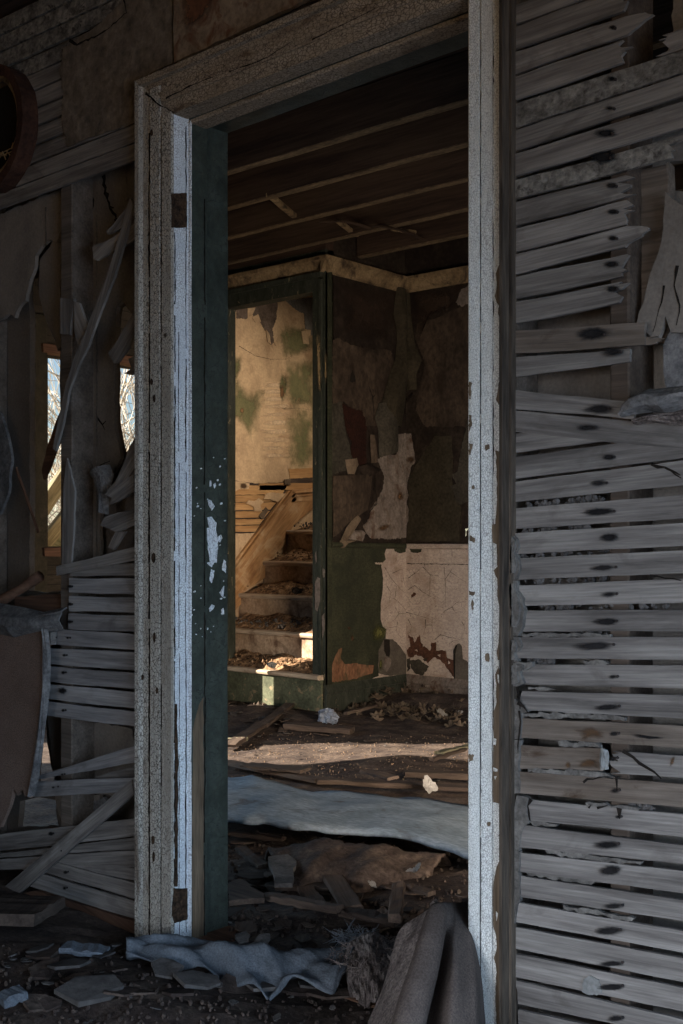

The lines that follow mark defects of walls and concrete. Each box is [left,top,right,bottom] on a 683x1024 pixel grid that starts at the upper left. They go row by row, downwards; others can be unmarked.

spalling [191,297,326,637]
spalling [342,404,422,553]
peeling [332,648,391,682]
peeling [407,634,454,677]